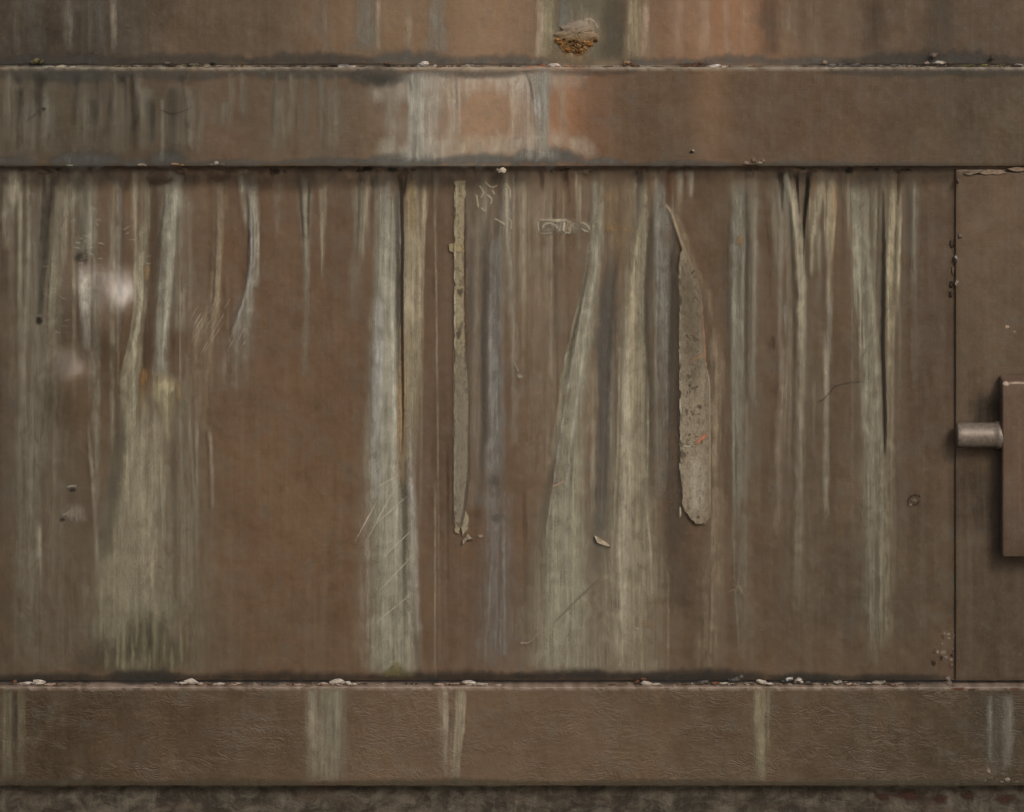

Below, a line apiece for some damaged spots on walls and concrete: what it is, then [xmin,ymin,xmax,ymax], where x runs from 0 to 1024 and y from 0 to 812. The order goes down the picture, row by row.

leakage [3,56,220,104]
leakage [52,111,184,166]
leakage [242,0,1019,178]
leakage [76,197,92,334]
leakage [112,190,178,637]
leakage [212,209,223,315]
leakage [238,187,258,329]
peeling [449,167,511,544]
leakage [357,176,937,786]
peeling [665,205,711,524]
crack [881,175,901,450]
leakage [0,671,359,774]